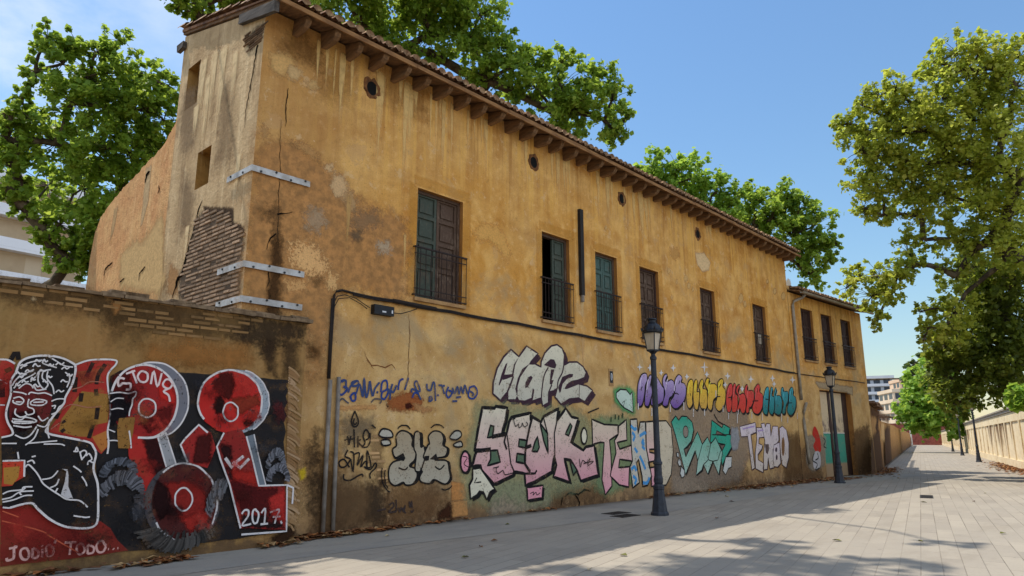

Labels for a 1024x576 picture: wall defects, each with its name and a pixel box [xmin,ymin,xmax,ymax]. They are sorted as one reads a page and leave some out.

crack [244,45,258,127]
peeling [242,21,319,90]
crack [266,90,291,315]
peeling [0,122,411,379]
crack [365,321,410,378]
spalling [340,391,432,413]